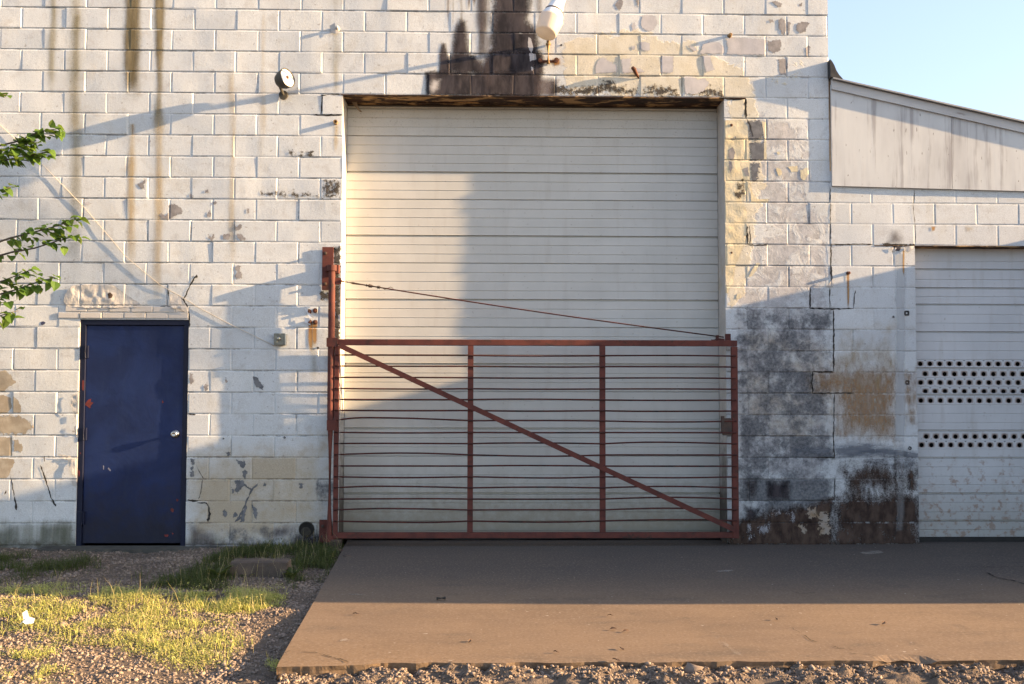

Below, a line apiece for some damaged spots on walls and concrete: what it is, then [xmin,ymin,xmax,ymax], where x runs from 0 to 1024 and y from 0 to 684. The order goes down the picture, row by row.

damp [125,0,139,86]
damp [155,0,164,125]
damp [425,0,680,97]
peeling [660,55,715,95]
peeling [767,1,809,76]
peeling [724,120,781,299]
rust [308,324,317,348]
crack [809,188,873,501]
peeling [0,370,34,478]
damp [795,444,918,467]
mould [746,481,789,519]
peeling [746,507,832,539]